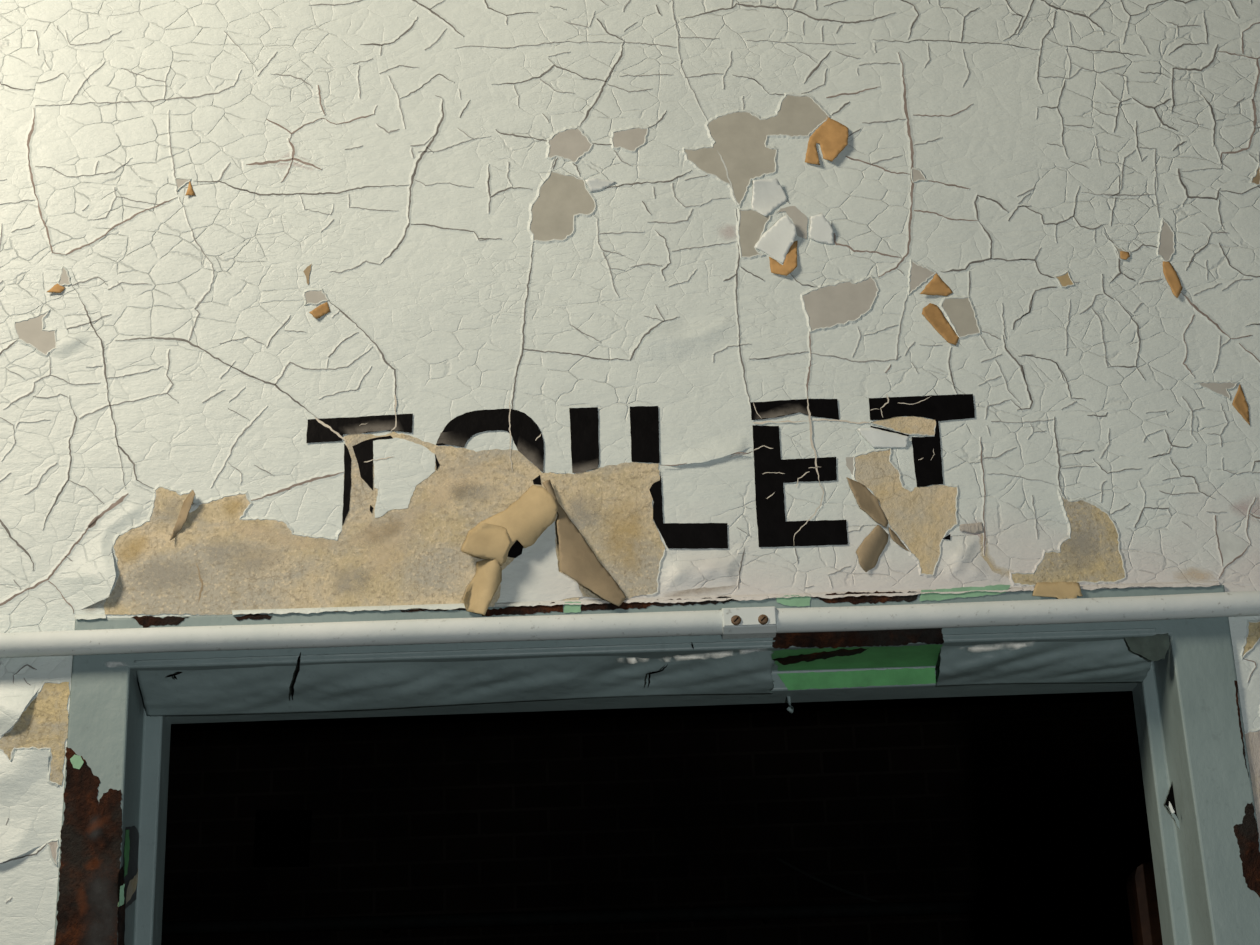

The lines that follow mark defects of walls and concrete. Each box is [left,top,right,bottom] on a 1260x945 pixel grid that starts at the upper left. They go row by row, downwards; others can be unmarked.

peeling [527,125,616,244]
peeling [682,92,849,276]
crack [0,0,1260,614]
peeling [800,274,881,333]
peeling [907,259,982,345]
peeling [1156,217,1183,298]
peeling [104,431,667,615]
peeling [846,416,1128,601]
peeling [771,644,943,690]
peeling [0,679,70,787]
corrosion [54,747,125,945]
corrosion [1233,803,1260,897]